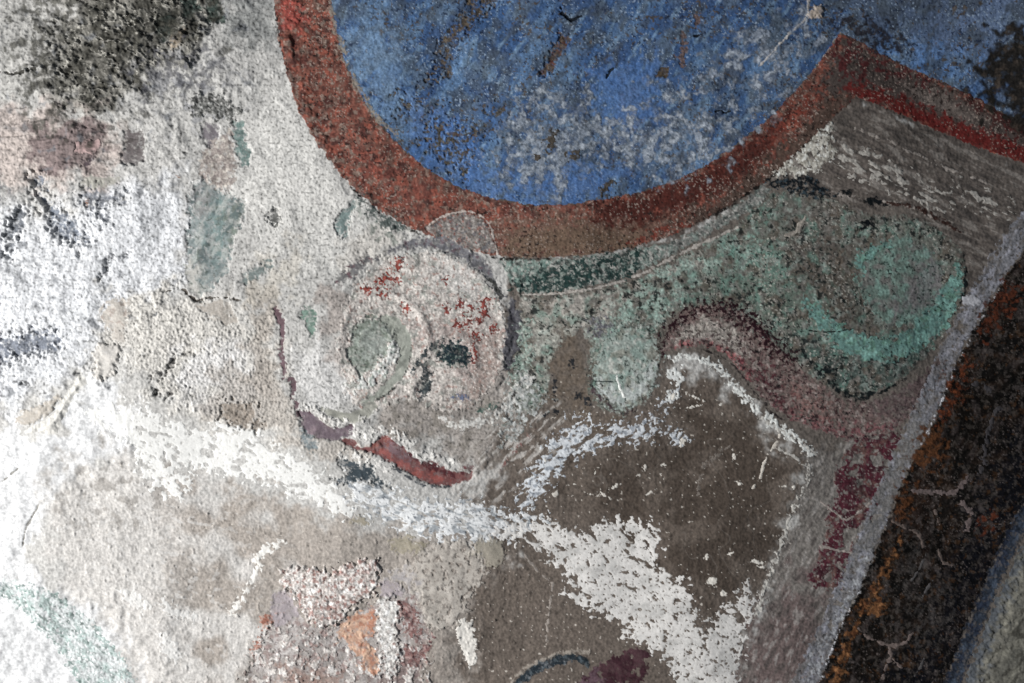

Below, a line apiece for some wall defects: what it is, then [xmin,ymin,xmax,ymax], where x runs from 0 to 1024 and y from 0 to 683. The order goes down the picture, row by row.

water stain [200,0,223,22]
water stain [54,0,202,112]
peeling [635,382,695,443]
peeling [664,352,818,500]
peeling [512,491,557,521]
peeling [751,579,771,620]
peeling [398,626,437,672]